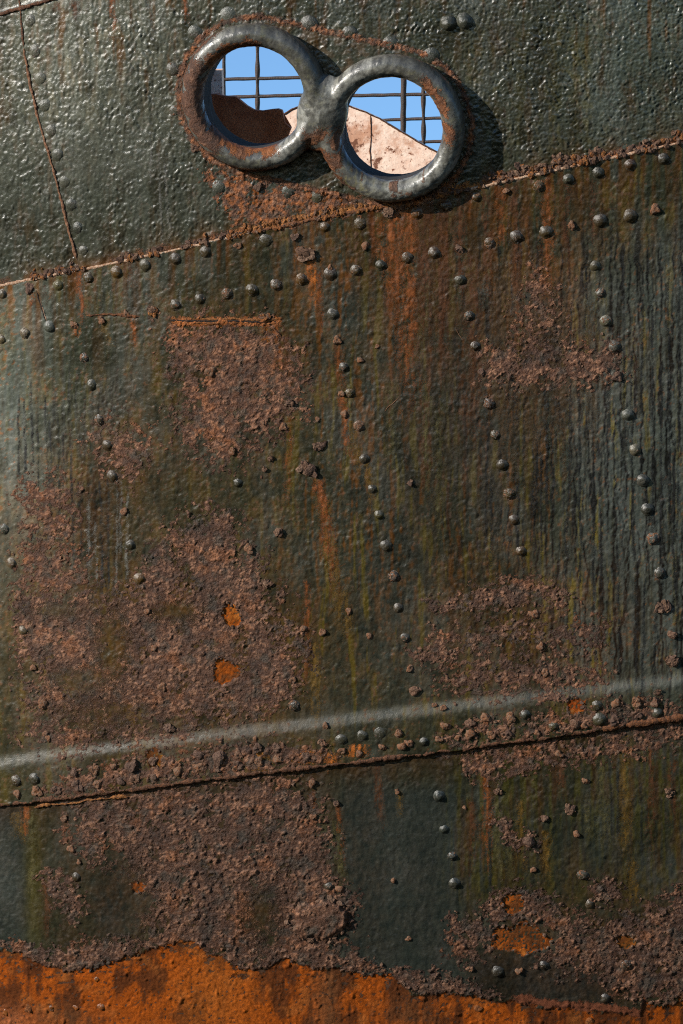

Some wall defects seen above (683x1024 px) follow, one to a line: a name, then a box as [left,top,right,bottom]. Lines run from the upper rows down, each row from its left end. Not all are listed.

corrosion [177,28,639,557]
peeling [221,601,243,629]
corrosion [0,246,683,1009]
peeling [213,657,240,685]
peeling [491,892,554,957]